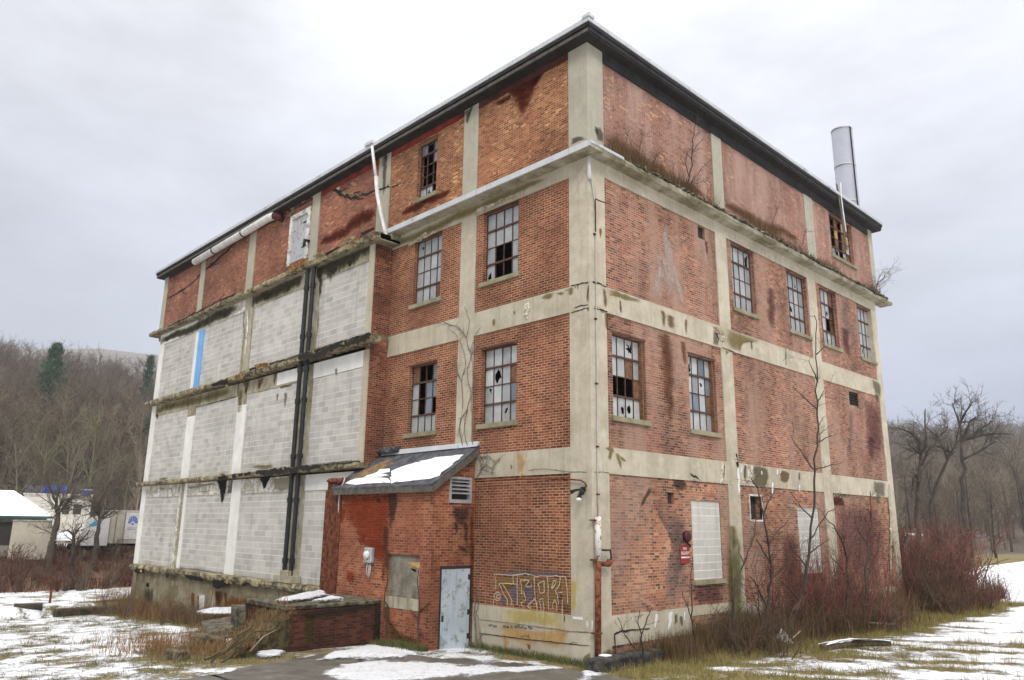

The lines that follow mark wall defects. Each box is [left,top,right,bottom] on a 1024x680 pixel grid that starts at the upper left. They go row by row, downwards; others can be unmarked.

leakage [497,74,542,108]
crack [333,183,401,200]
spalling [288,227,374,272]
leakage [317,212,373,294]
crack [166,243,248,364]
spalling [298,332,371,359]
spalling [211,362,270,387]
spalling [189,465,321,492]